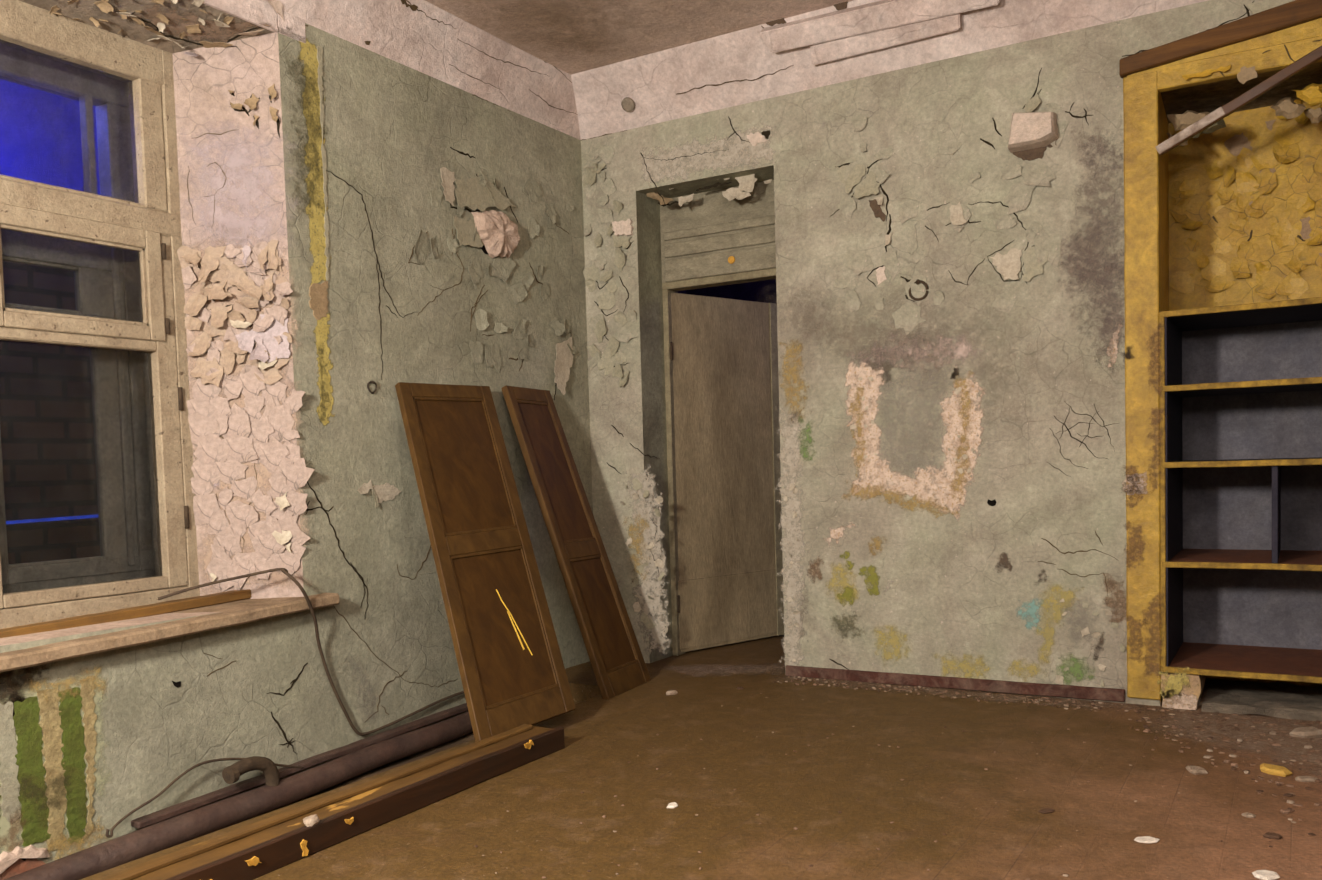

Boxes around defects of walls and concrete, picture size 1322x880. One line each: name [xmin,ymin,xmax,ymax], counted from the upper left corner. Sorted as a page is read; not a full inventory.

peeling [50,0,284,57]
crack [406,0,775,204]
crack [678,65,793,94]
peeling [177,25,335,592]
crack [326,147,576,379]
damp [1065,137,1124,367]
peeling [841,332,985,519]
peeling [0,667,110,880]
crack [267,663,308,754]
crack [286,481,457,722]
peeling [607,425,670,654]
peeling [1010,570,1199,710]